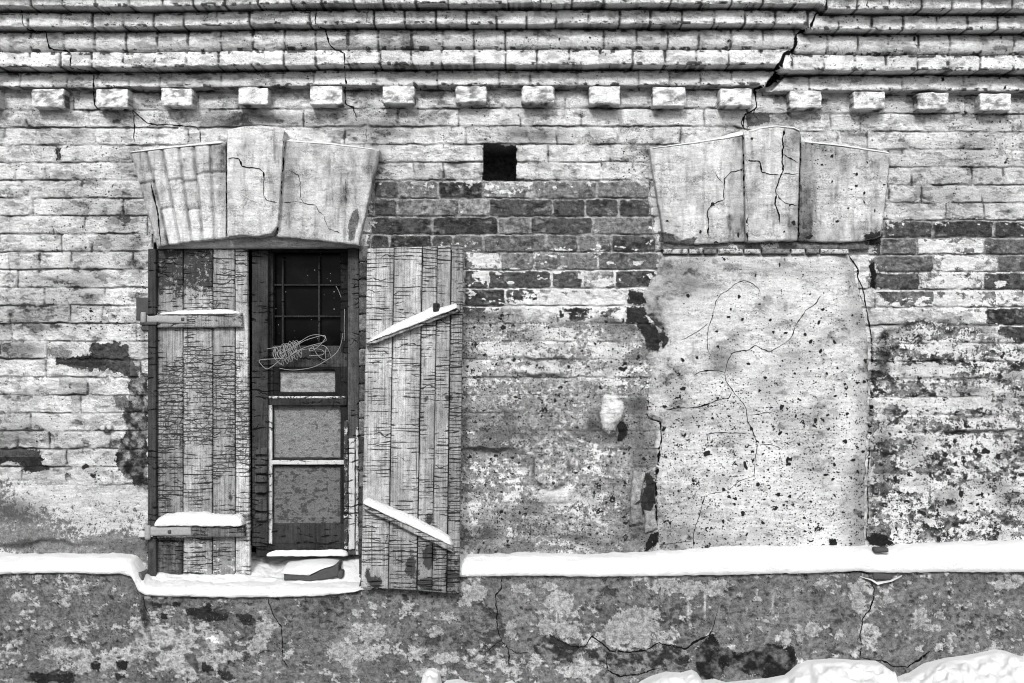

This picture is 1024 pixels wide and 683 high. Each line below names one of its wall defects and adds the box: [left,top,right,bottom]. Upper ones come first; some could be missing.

crack [21,10,339,234]
crack [707,0,827,241]
peeling [347,177,702,351]
peeling [864,216,1024,350]
spalling [0,445,49,473]
peeling [47,340,148,491]
crack [632,280,820,546]
crack [487,576,527,664]
crack [552,612,718,677]
crack [836,571,930,668]